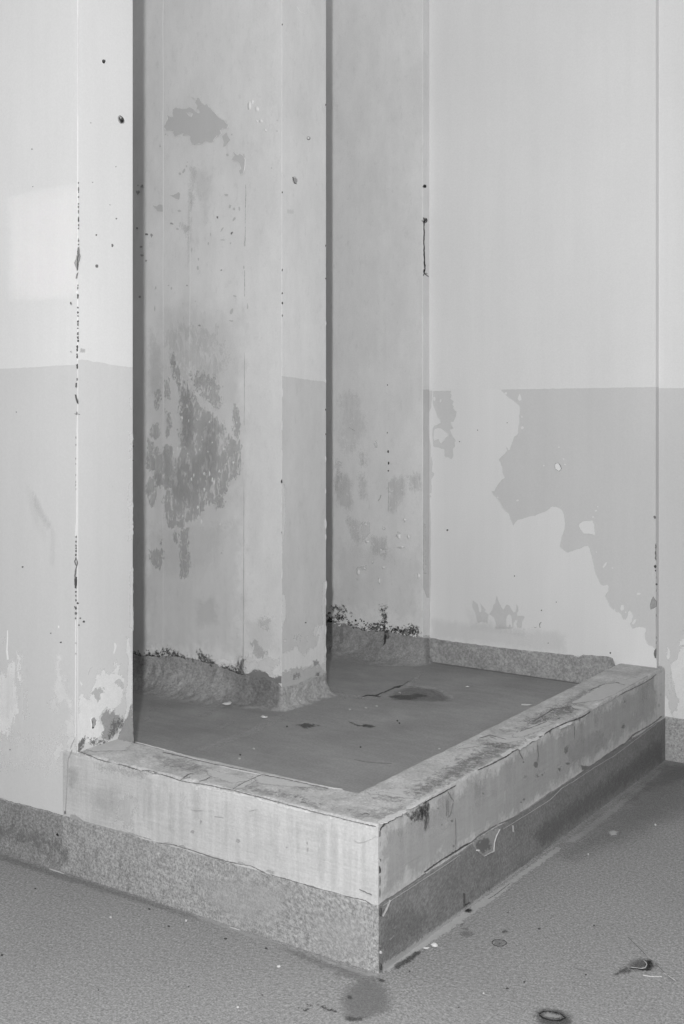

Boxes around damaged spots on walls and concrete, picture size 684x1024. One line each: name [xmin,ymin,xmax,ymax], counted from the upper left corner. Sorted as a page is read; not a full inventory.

peeling [159,97,245,175]
crack [422,218,430,277]
peeling [70,182,134,758]
peeling [164,381,241,529]
peeling [217,388,684,719]
water stain [326,605,419,637]
flaking render [195,785,311,813]
flaking render [472,828,500,856]